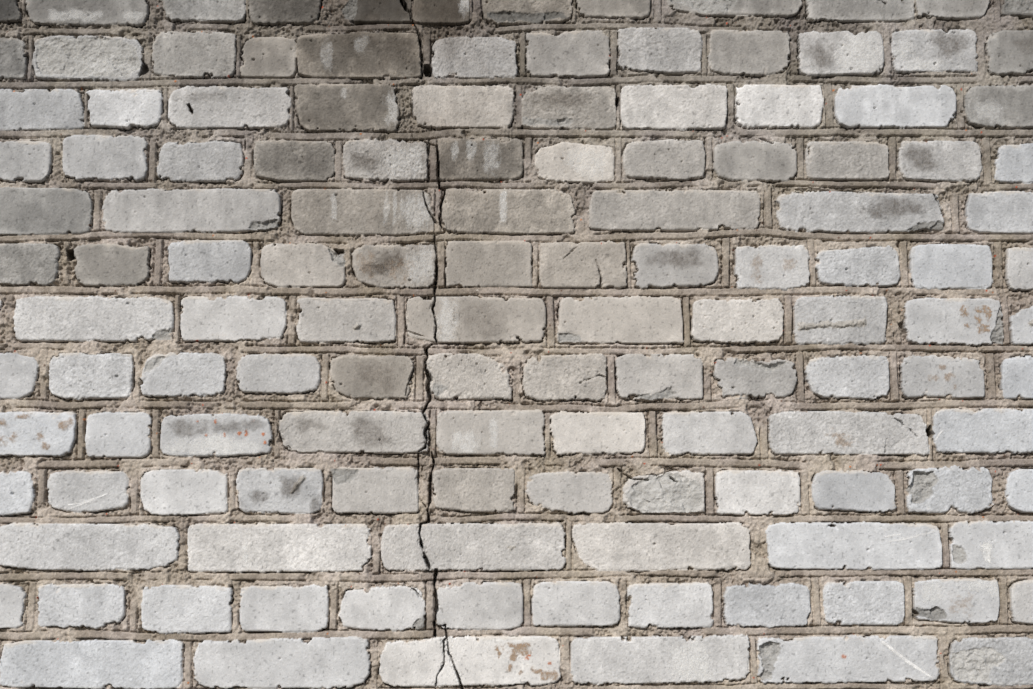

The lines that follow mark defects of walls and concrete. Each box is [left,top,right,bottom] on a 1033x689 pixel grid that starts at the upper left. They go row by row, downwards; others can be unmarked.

rust [961,305,992,332]
crack [400,0,464,689]
rust [495,643,557,680]